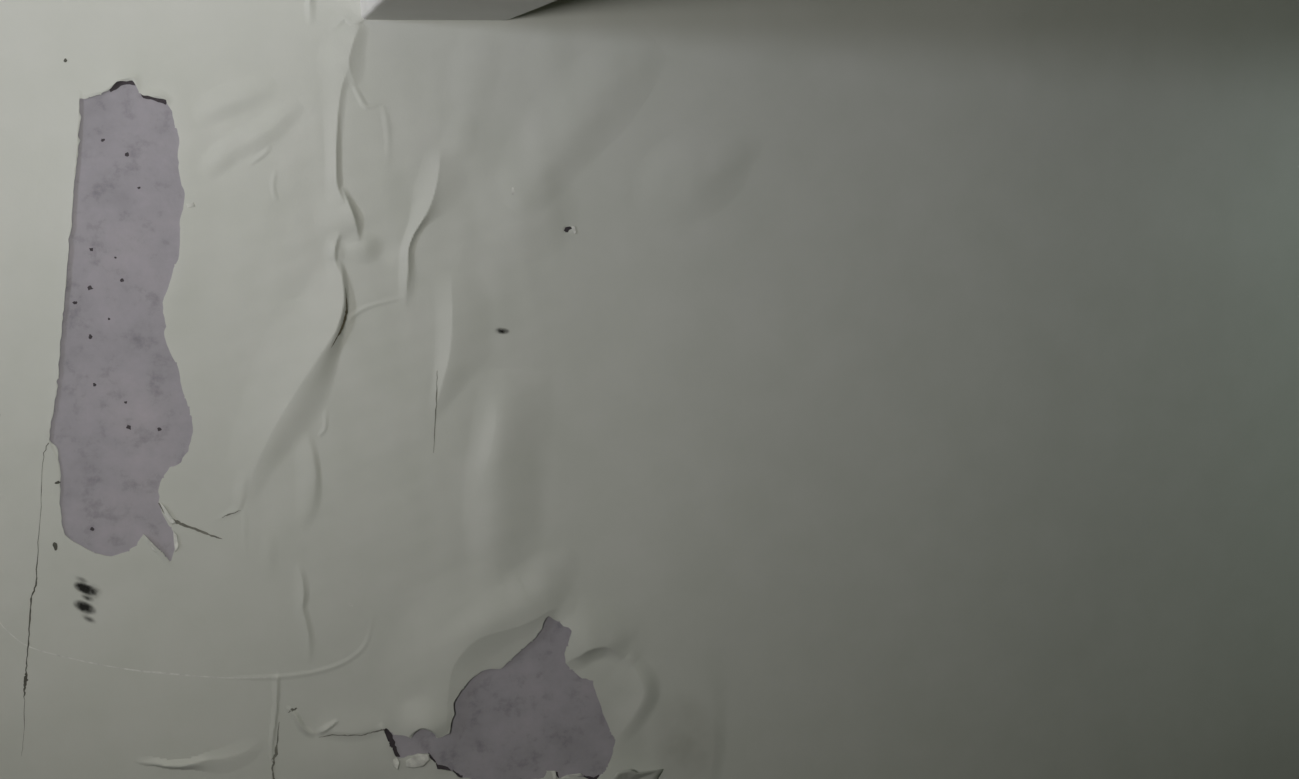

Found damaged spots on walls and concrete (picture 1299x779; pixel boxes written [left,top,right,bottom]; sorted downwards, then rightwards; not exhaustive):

peeling [13,44,230,597]
crack [21,443,49,756]
crack [271,708,297,779]
crack [323,729,385,737]
peeling [352,562,664,779]